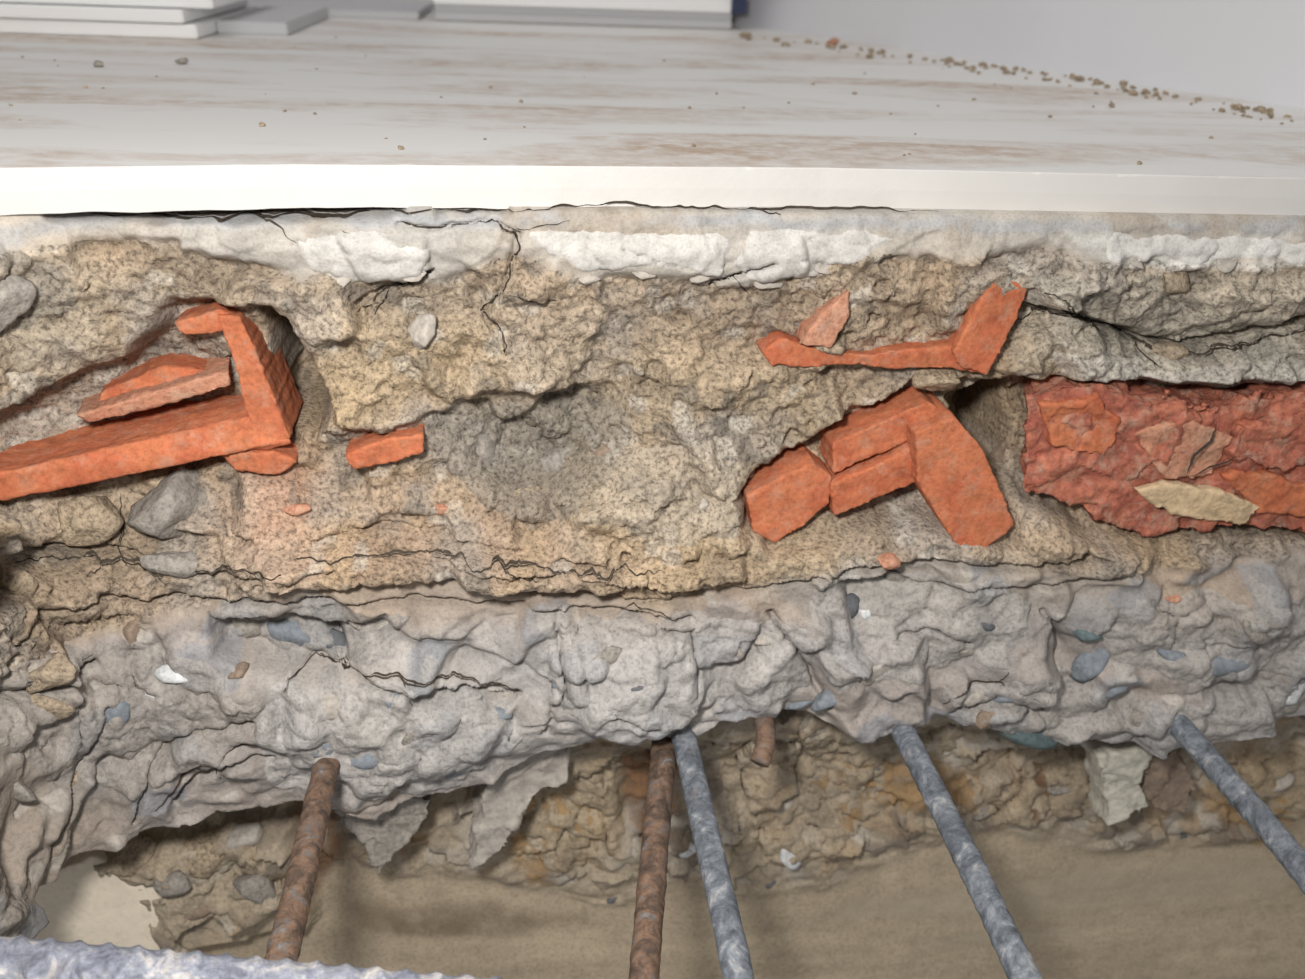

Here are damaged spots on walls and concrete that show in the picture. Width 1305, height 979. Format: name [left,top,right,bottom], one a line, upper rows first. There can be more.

crack [90,201,931,356]
crack [15,493,164,579]
crack [195,548,672,620]
crack [292,638,519,706]
spalling [0,596,523,979]
spalling [499,757,626,873]
spalling [546,568,1305,979]